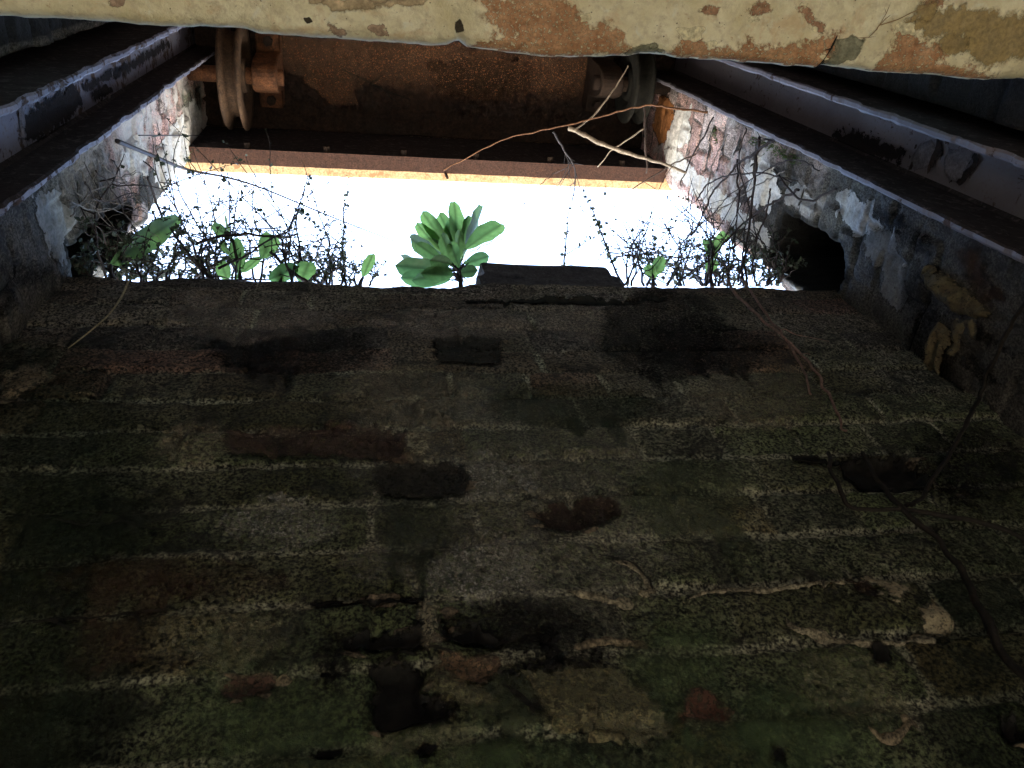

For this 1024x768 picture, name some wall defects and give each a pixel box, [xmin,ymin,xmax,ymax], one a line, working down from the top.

peeling [327,22,347,37]
peeling [367,24,389,37]
rust [282,35,588,105]
peeling [468,0,632,57]
peeling [667,0,842,67]
peeling [872,22,1002,79]
rust [652,95,675,145]